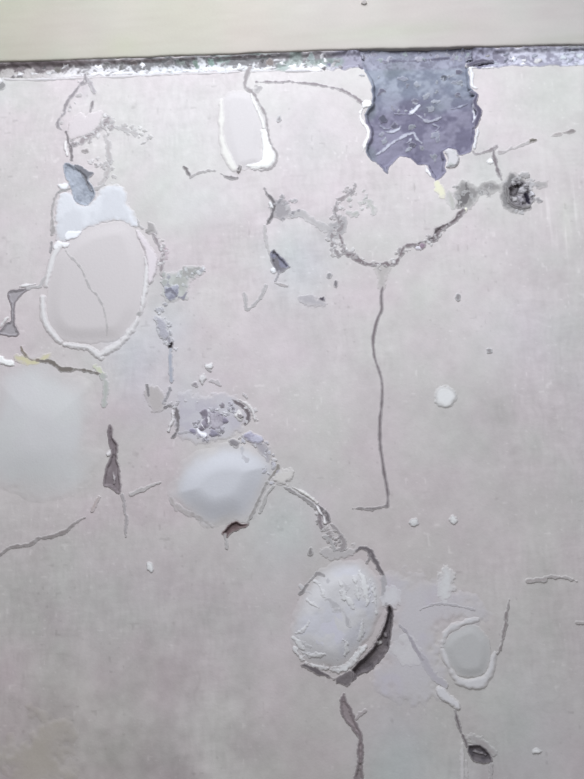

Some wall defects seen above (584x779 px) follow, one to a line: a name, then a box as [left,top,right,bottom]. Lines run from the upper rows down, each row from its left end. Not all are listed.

crack [55,71,154,186]
spalling [0,45,584,181]
peeling [53,162,138,250]
crack [182,65,468,512]
crack [0,193,162,557]
spalling [143,302,280,485]
crack [221,467,394,779]
crack [496,599,510,655]
crack [525,574,578,584]
crack [454,709,498,779]